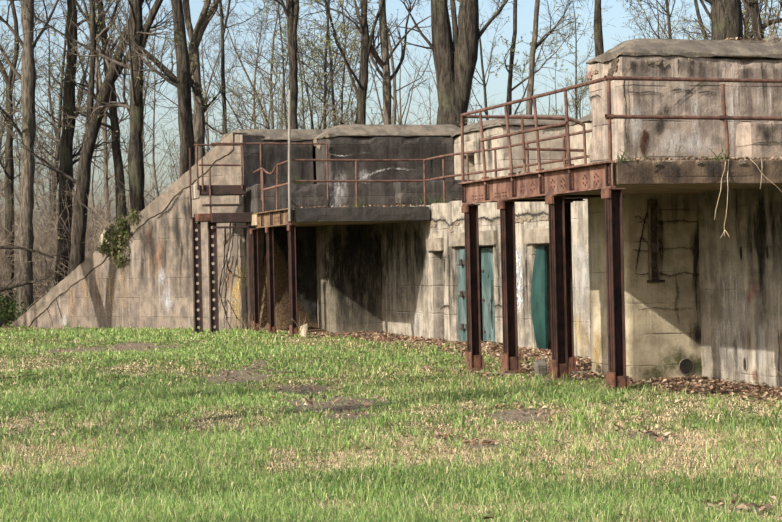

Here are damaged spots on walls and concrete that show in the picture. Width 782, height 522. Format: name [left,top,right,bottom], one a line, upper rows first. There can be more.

corrosion [640,130,648,155]
leakage [280,224,425,310]
crack [633,213,699,320]
leakage [736,198,782,295]